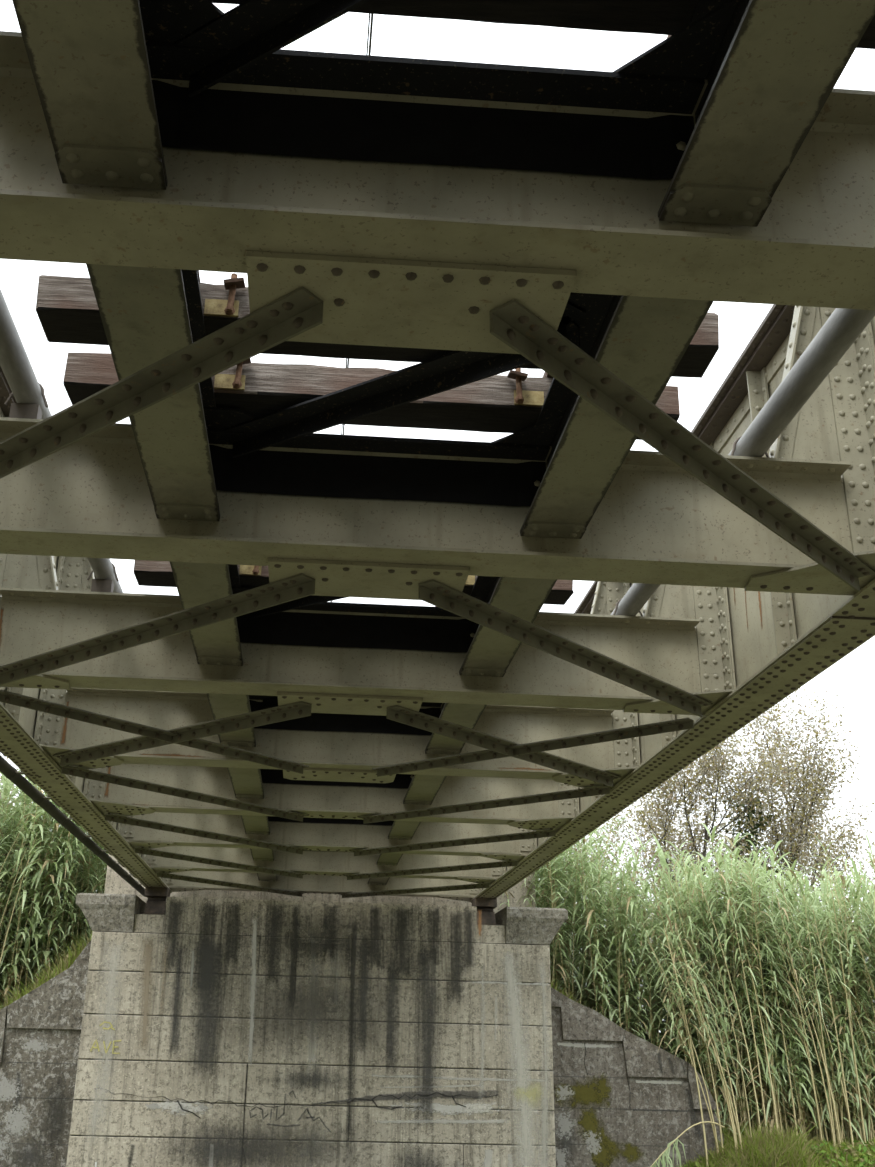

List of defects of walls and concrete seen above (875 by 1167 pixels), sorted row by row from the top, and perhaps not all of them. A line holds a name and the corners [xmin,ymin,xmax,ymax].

leakage [142,901,612,1167]
crack [95,1070,498,1167]
leakage [636,1054,701,1137]